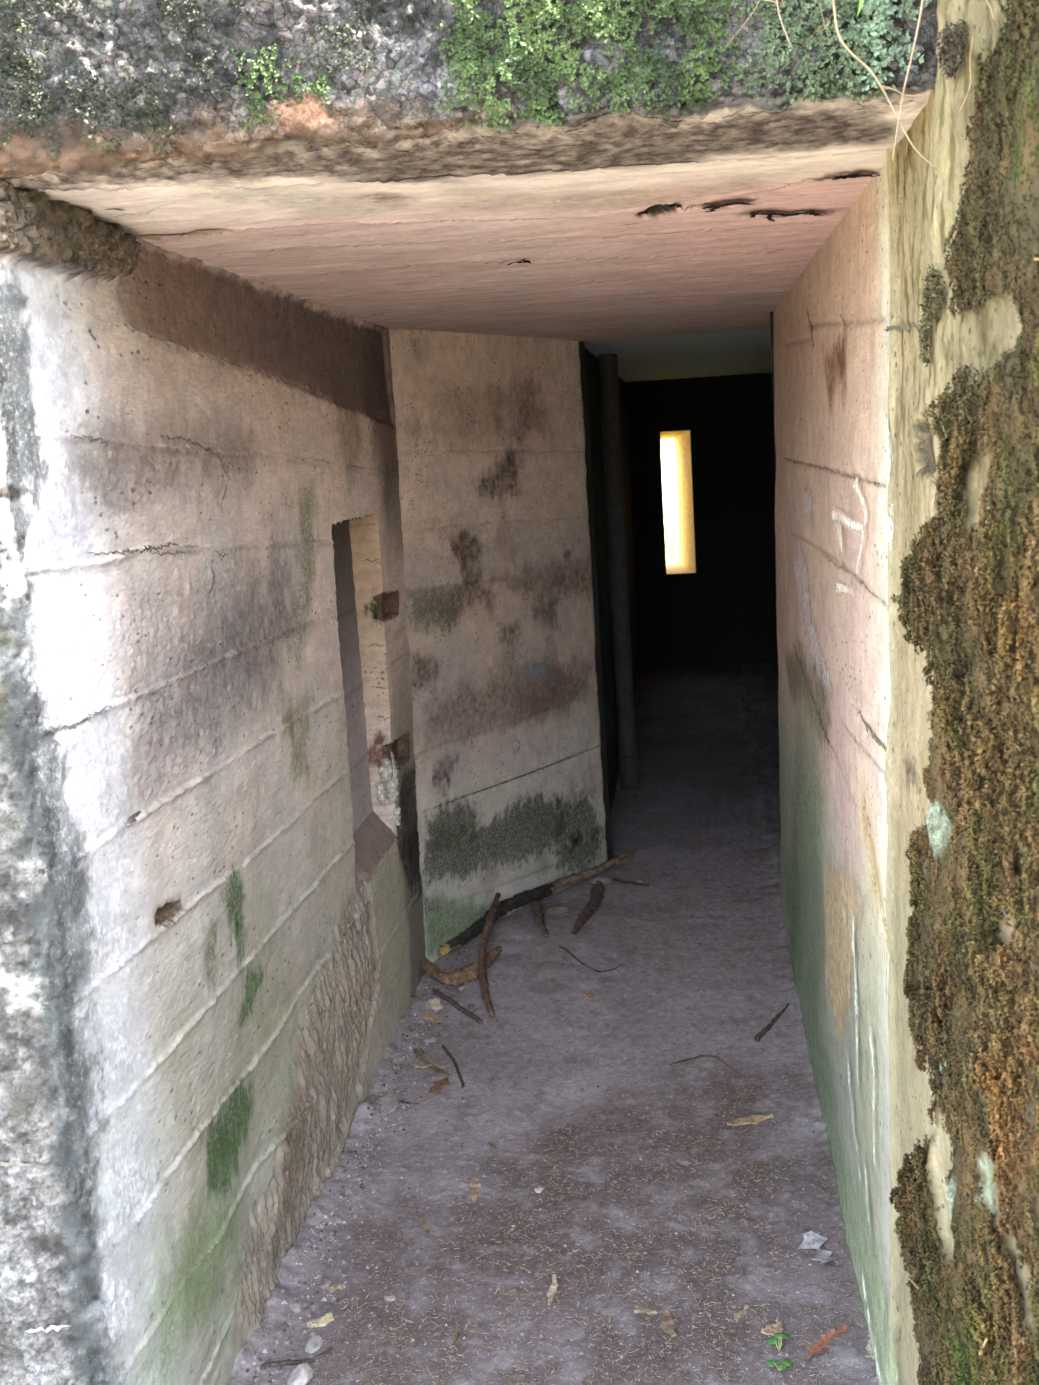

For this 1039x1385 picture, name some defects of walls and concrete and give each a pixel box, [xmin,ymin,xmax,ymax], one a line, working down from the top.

spalling [638,204,681,217]
crack [84,542,229,598]
rust [368,731,385,768]
spalling [155,899,182,927]